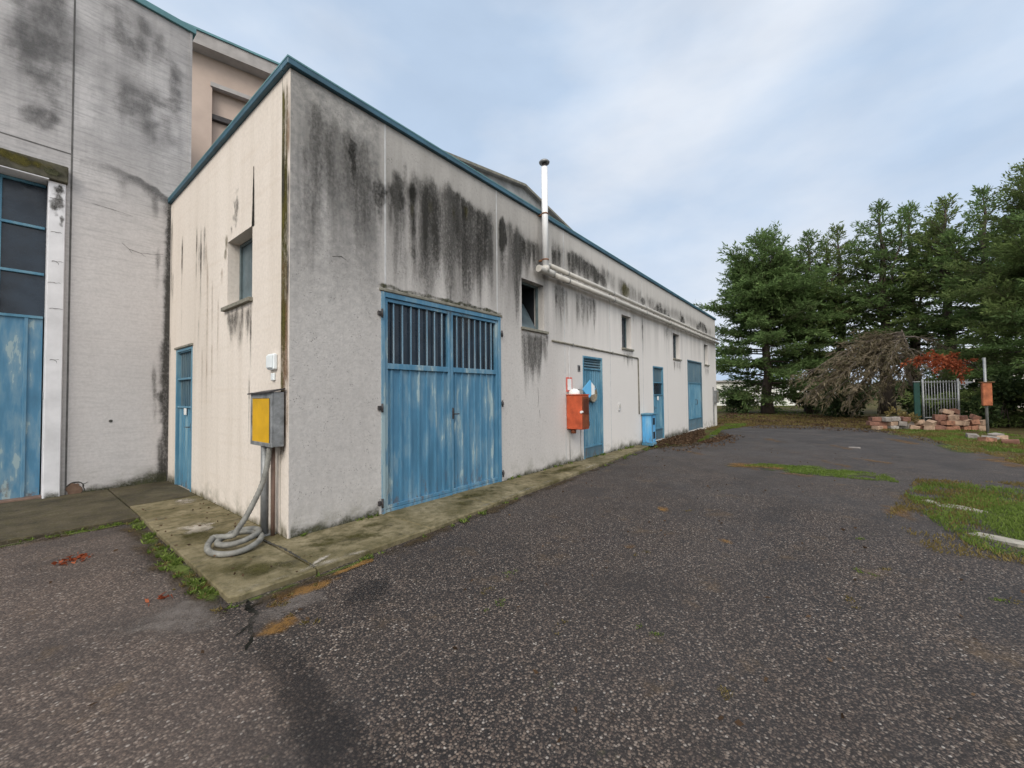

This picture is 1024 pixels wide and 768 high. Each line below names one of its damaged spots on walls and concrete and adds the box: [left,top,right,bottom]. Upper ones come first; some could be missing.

leakage [376,174,439,252]
leakage [452,192,531,282]
leakage [552,251,604,285]
leakage [129,176,182,482]
leakage [524,335,548,371]
crack [236,600,285,650]